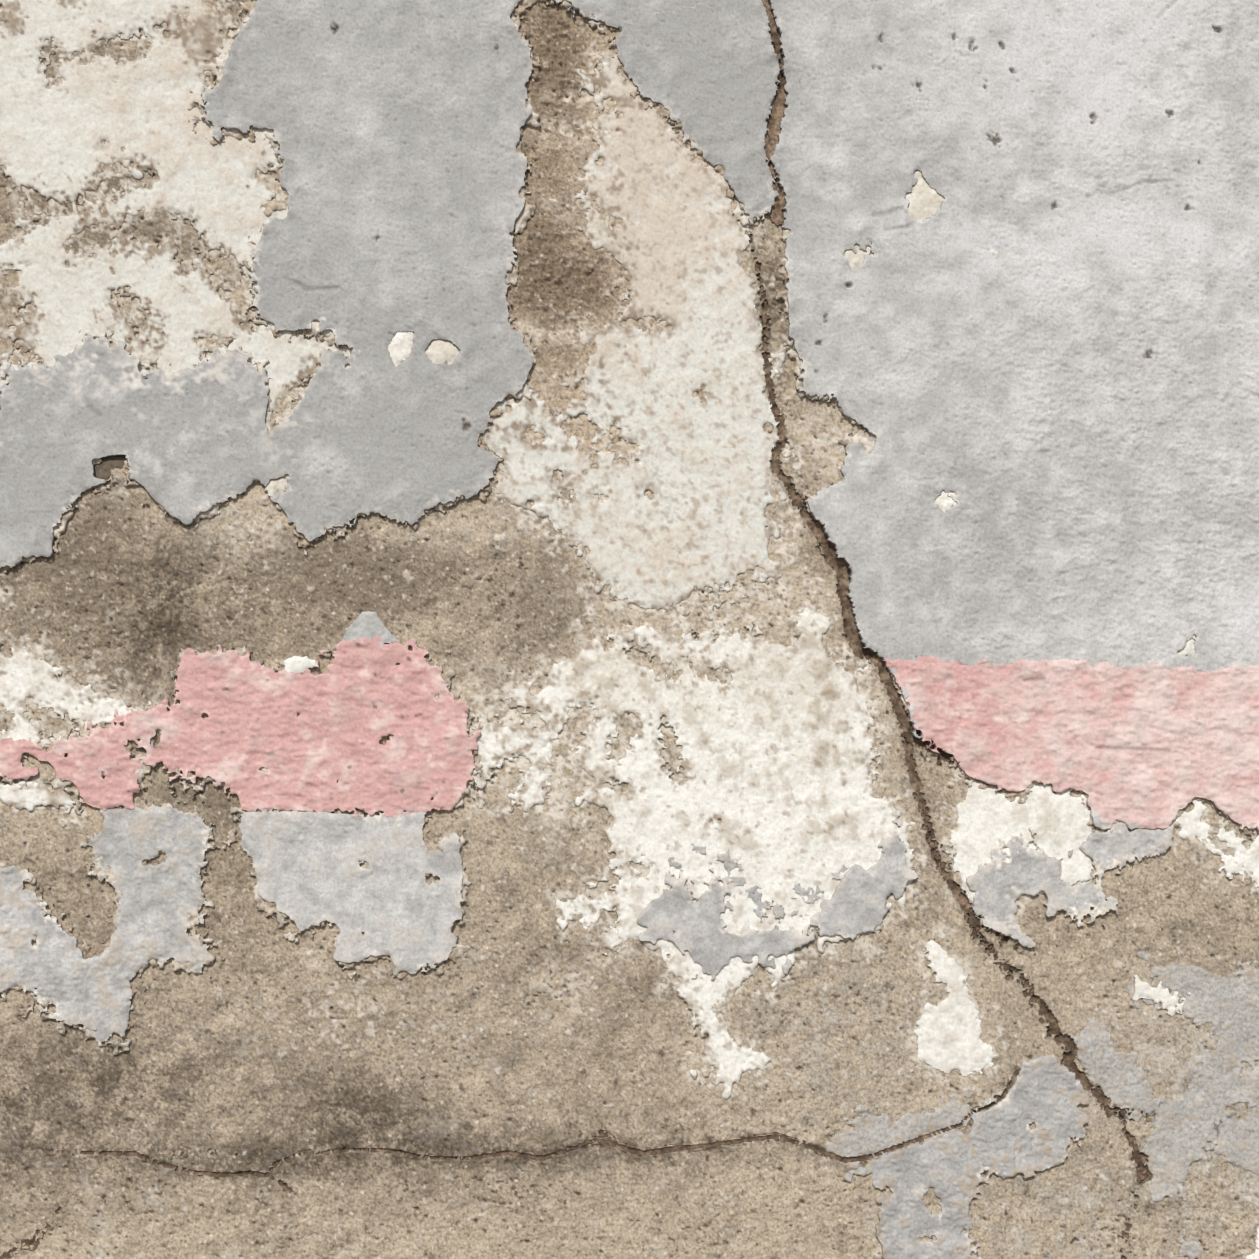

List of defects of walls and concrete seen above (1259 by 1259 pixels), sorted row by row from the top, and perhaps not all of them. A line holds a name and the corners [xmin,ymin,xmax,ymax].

peeling [0,0,353,427]
peeling [478,1,874,610]
crack [21,1068,1021,1193]
spalling [0,455,1259,1259]
crack [749,0,1156,1259]